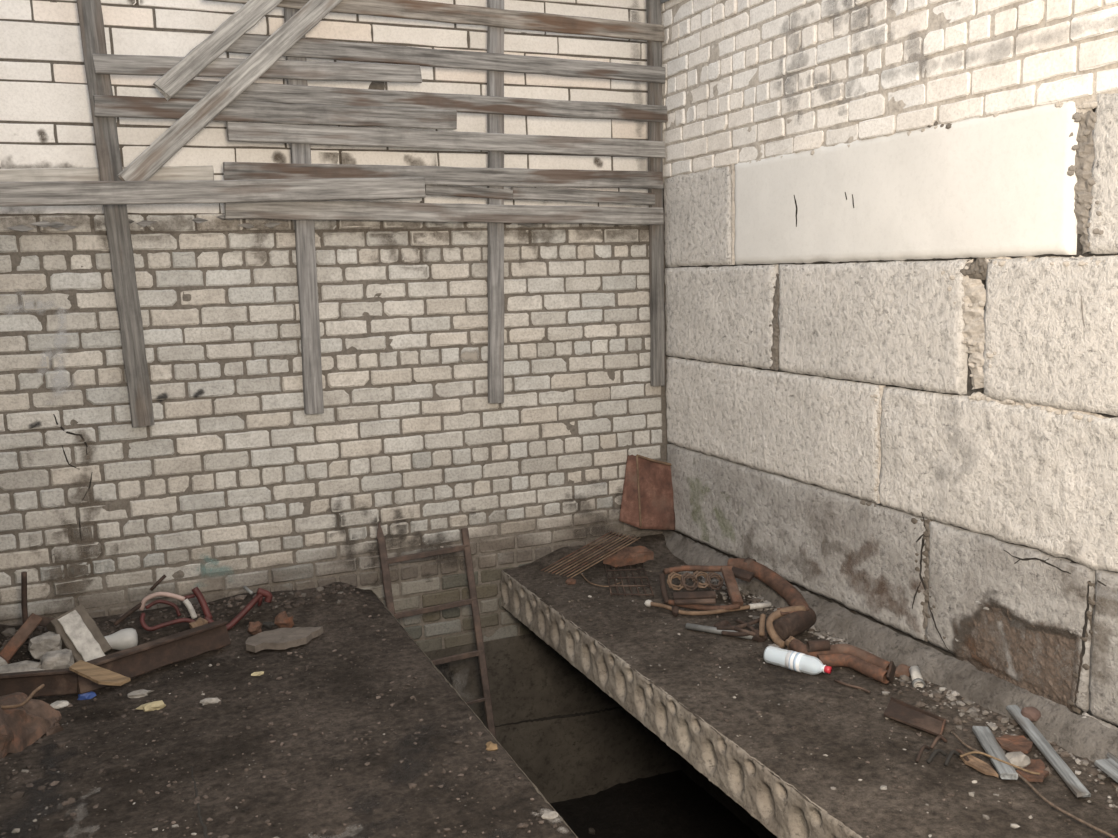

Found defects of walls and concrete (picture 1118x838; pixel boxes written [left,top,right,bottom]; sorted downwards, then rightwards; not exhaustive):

water stain [50,434,103,600]
spalling [911,518,935,618]
crack [912,512,950,651]
spalling [943,581,1118,731]
crack [1004,550,1107,707]